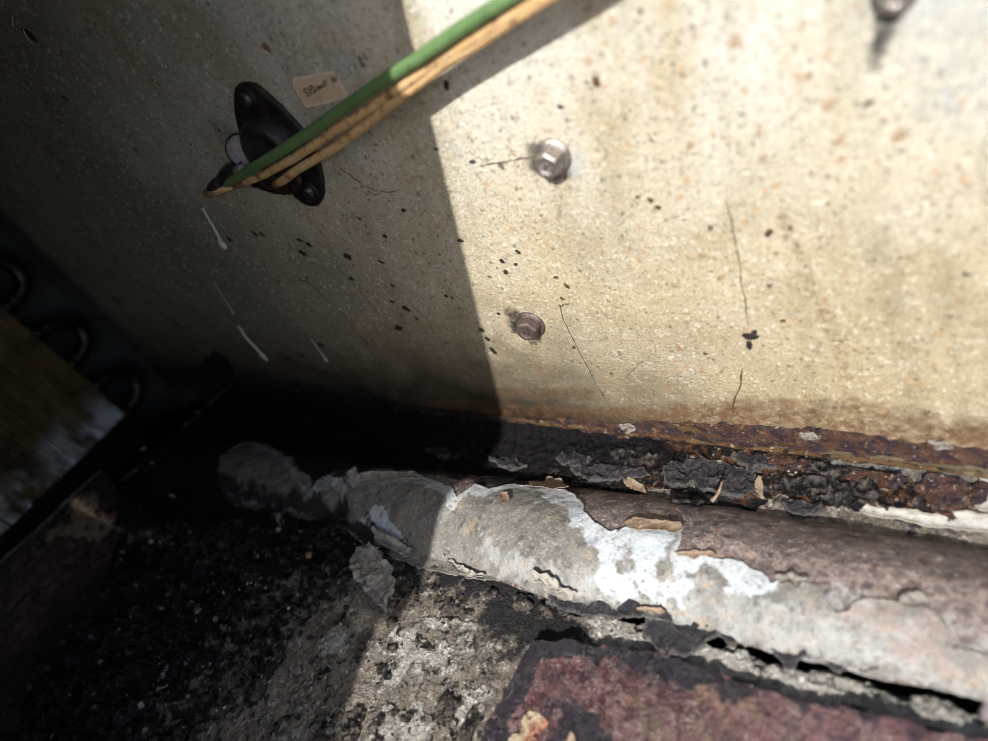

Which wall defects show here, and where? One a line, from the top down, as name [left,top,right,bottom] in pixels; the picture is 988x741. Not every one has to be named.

crack [725,199,749,325]
crack [560,303,610,408]
crack [732,368,743,418]
rust [398,394,988,469]
peeling [217,386,988,701]
spalling [265,715,294,740]
spalling [313,707,418,741]
spalling [431,691,484,741]